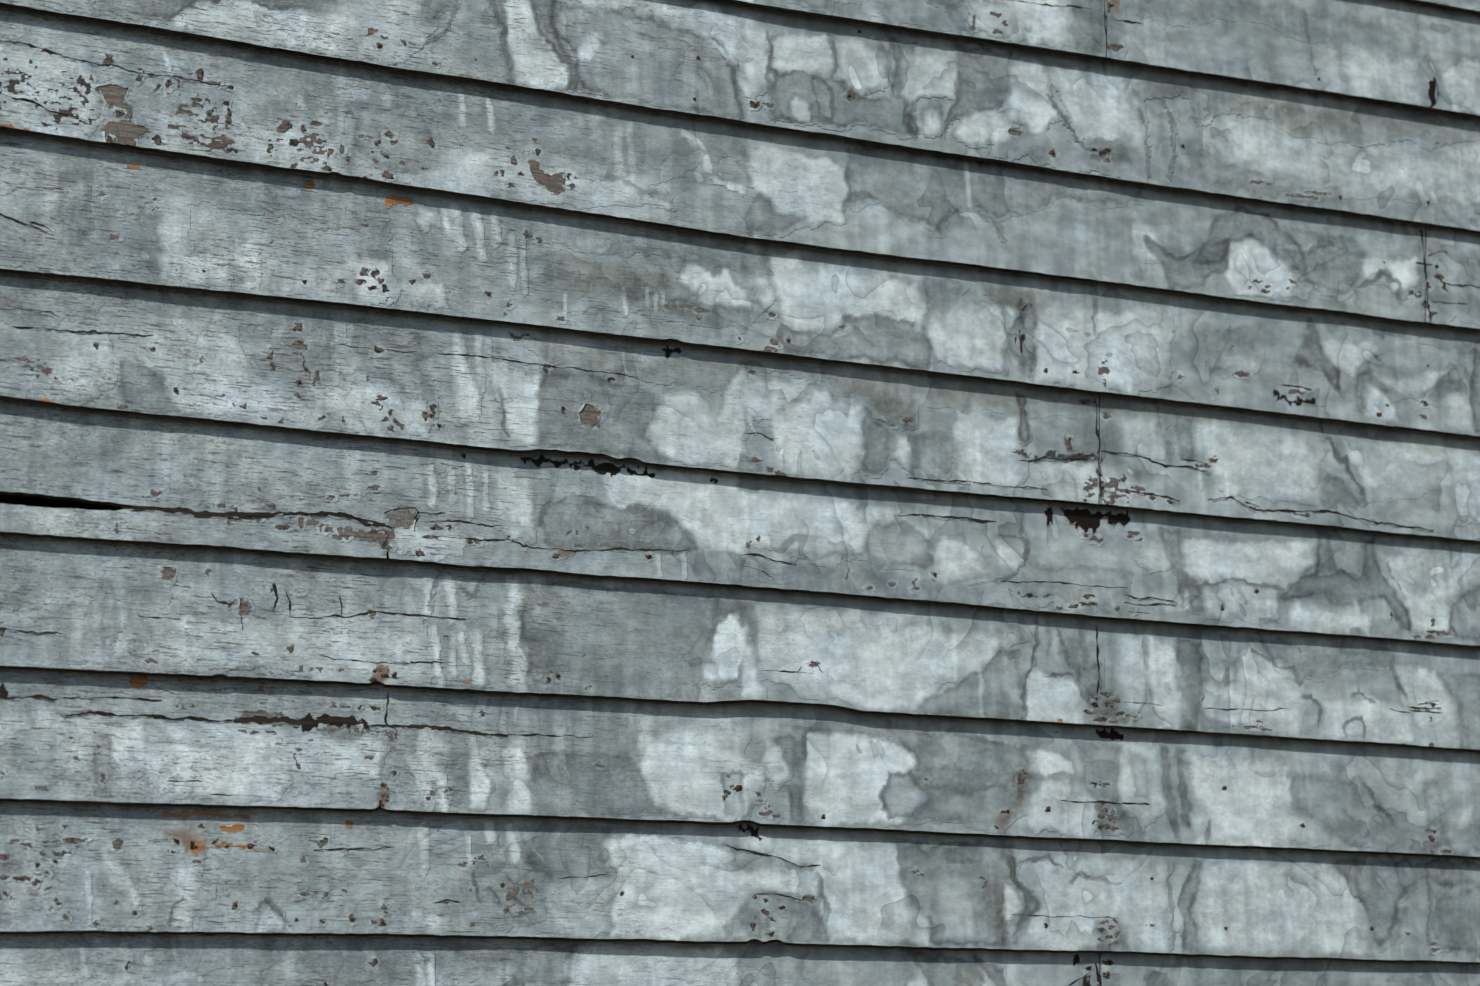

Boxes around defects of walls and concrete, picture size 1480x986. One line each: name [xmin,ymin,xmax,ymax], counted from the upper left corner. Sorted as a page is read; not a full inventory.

peeling [0,58,242,157]
damp [0,0,1480,304]
damp [0,155,442,431]
crack [121,506,690,552]
crack [1127,453,1434,532]
crack [0,627,66,637]
damp [0,539,490,689]
crack [319,596,466,623]
damp [400,200,1480,986]
crack [0,655,594,743]
damp [0,694,399,845]
rust [160,809,277,867]